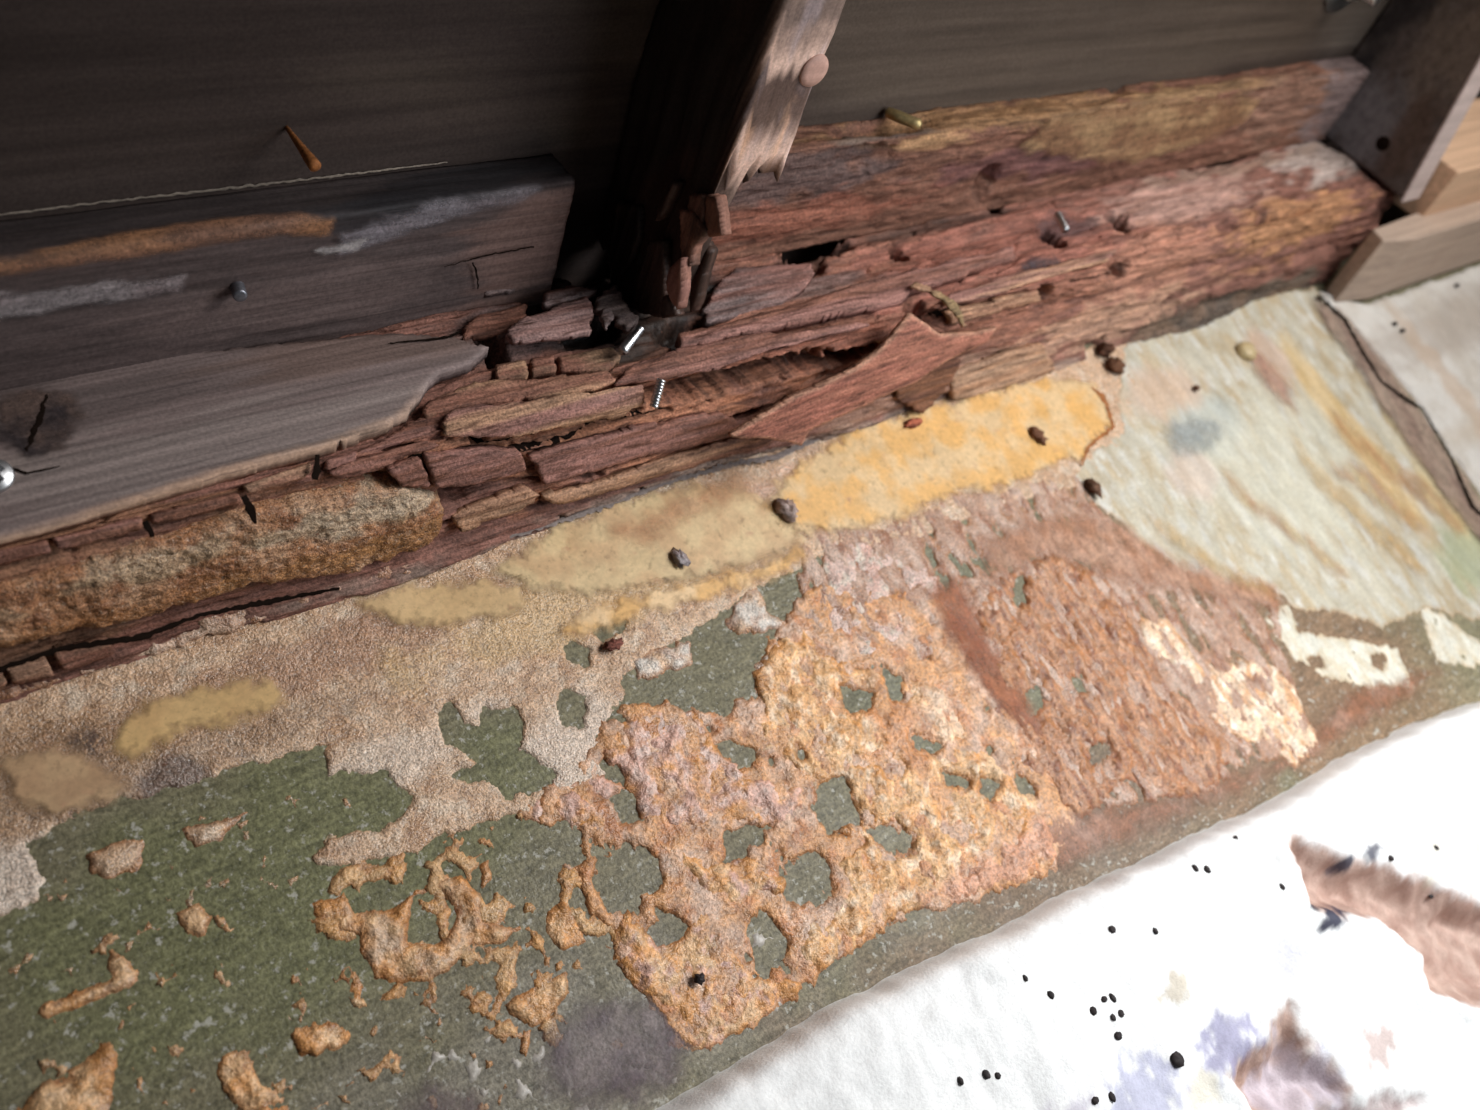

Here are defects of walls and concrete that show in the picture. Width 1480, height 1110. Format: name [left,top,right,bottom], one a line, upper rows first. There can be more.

crack [13,394,60,474]
peeling [311,584,1076,1057]
peeling [90,921,161,956]
peeling [214,915,234,932]
peeling [213,963,231,987]
peeling [289,968,351,1057]
peeling [38,1059,67,1078]
peeling [152,1045,184,1058]
peeling [312,1049,405,1110]